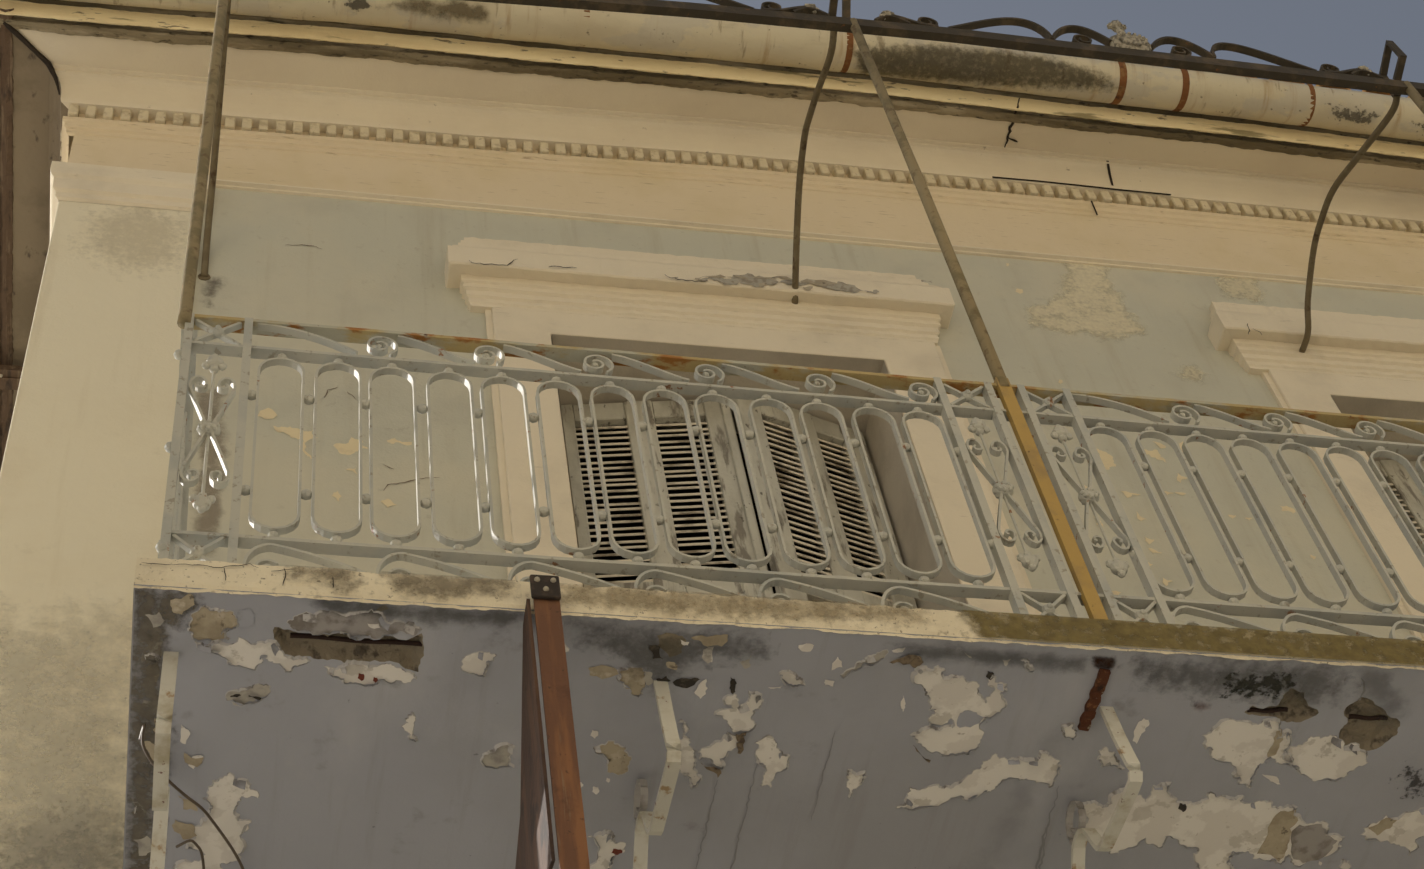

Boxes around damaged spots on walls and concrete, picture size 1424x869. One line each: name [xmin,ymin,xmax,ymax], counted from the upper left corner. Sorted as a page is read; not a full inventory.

peeling [134,836,151,856]
peeling [180,724,204,769]
peeling [172,772,260,869]
spalling [144,593,424,707]
peeling [588,633,728,699]
peeling [678,655,806,789]
peeling [824,647,1061,811]
rust [1077,657,1115,731]
peeling [1082,688,1424,869]
mould [1221,671,1296,700]